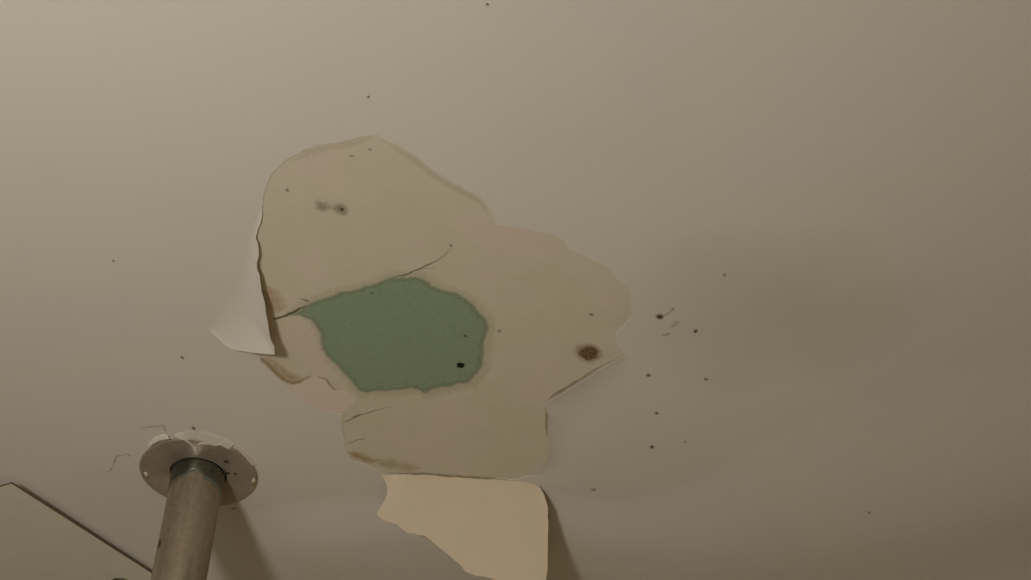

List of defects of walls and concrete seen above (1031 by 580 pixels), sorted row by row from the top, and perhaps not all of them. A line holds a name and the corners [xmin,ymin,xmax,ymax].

peeling [210,135,636,580]